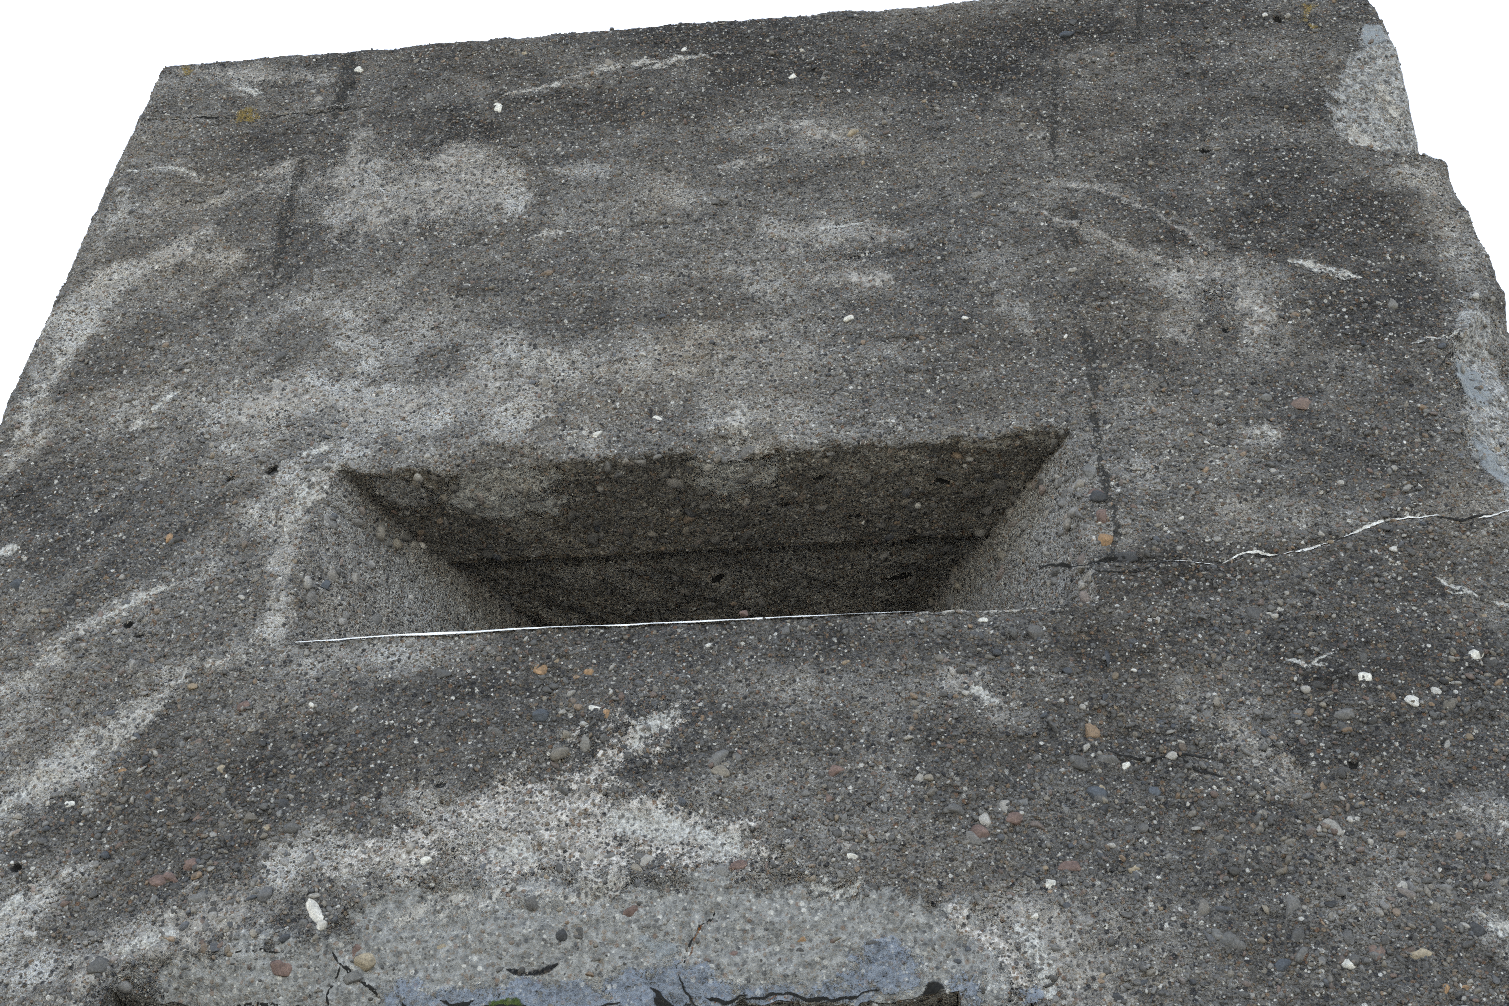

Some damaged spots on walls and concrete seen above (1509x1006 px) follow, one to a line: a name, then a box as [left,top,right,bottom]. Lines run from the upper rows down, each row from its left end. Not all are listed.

crack [1038,510,1509,573]
crack [206,928,382,1006]
crack [601,912,716,1006]
crack [742,989,880,1002]